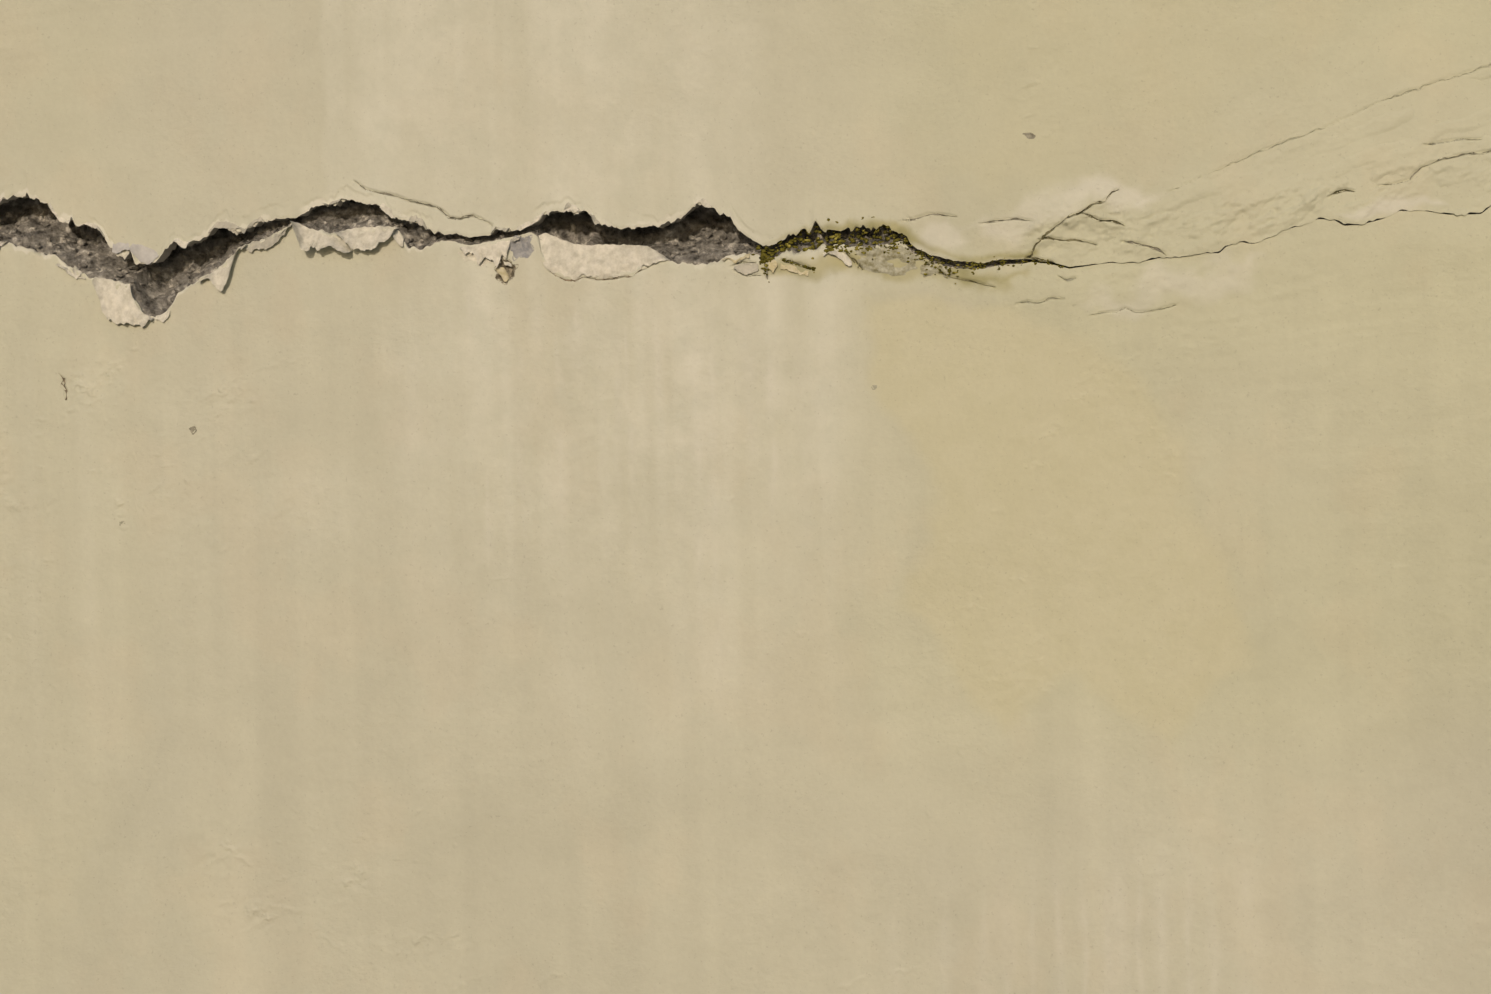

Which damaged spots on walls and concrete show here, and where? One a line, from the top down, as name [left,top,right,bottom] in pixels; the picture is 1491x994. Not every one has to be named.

crack [1175,64,1491,189]
peeling [458,235,534,285]
crack [0,138,1491,327]
damp [196,0,1016,863]